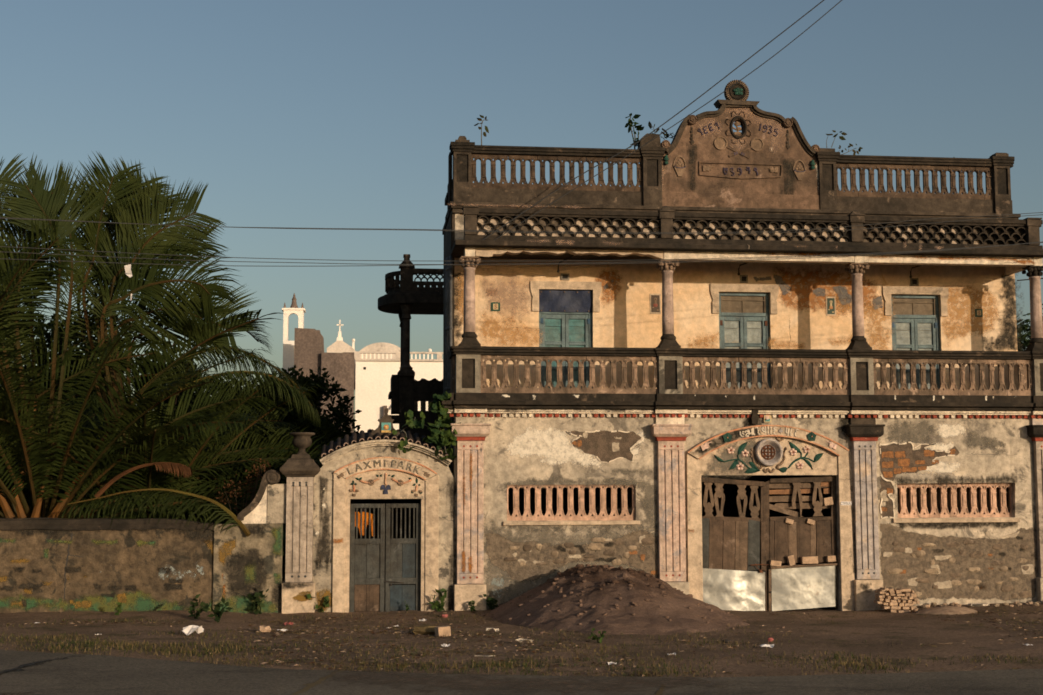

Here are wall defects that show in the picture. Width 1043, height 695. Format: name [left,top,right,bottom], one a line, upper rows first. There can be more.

peeling [597,271,621,302]
leakage [982,274,1022,351]
peeling [507,427,646,467]
leakage [248,524,264,537]
leakage [222,547,309,610]
spalling [485,530,659,582]
spalling [879,424,1038,601]